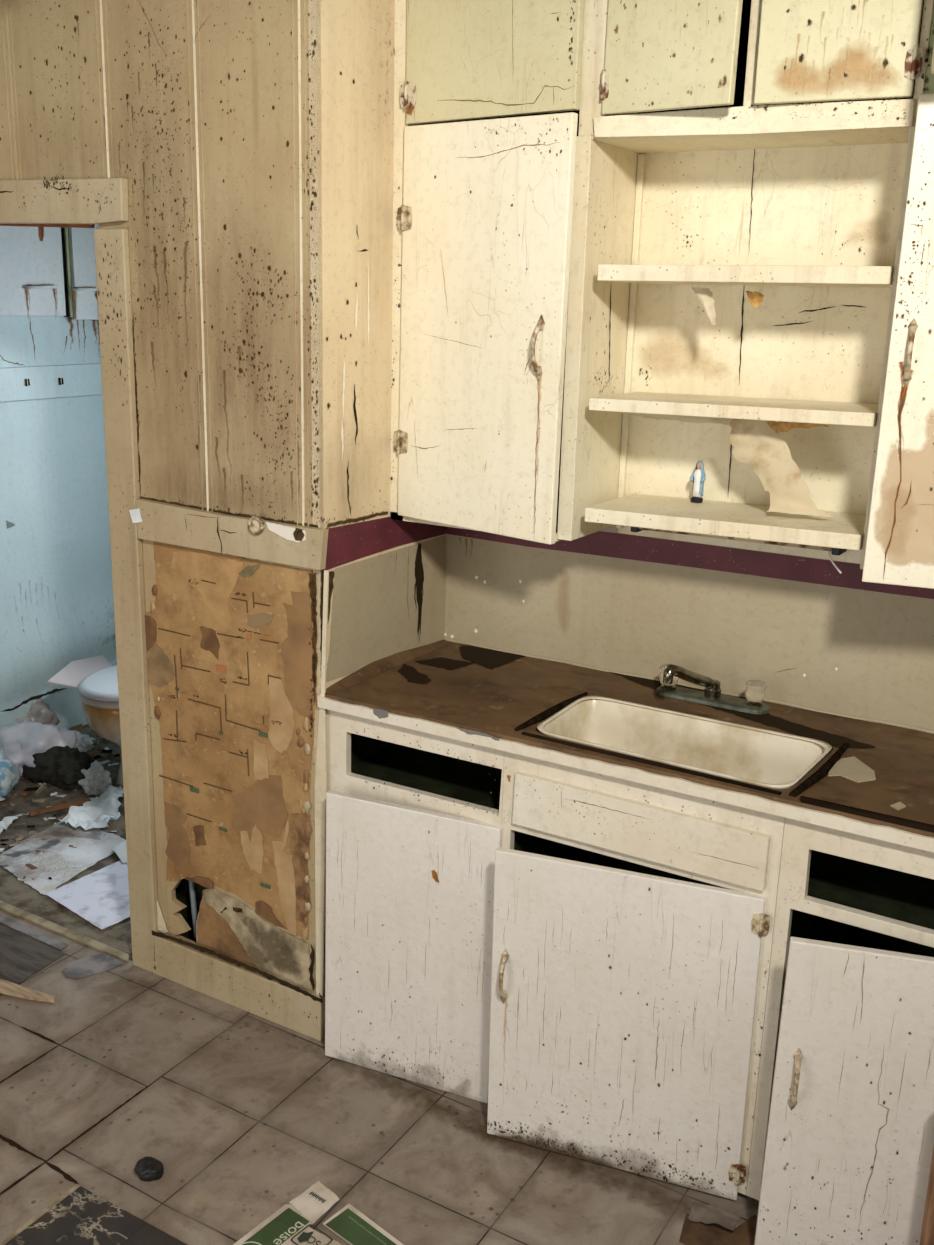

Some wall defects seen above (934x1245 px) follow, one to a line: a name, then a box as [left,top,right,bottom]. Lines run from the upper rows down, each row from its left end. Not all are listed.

rust [65,317,100,347]
crack [414,543,424,638]
peeling [296,717,312,860]
flaking render [202,888,312,990]